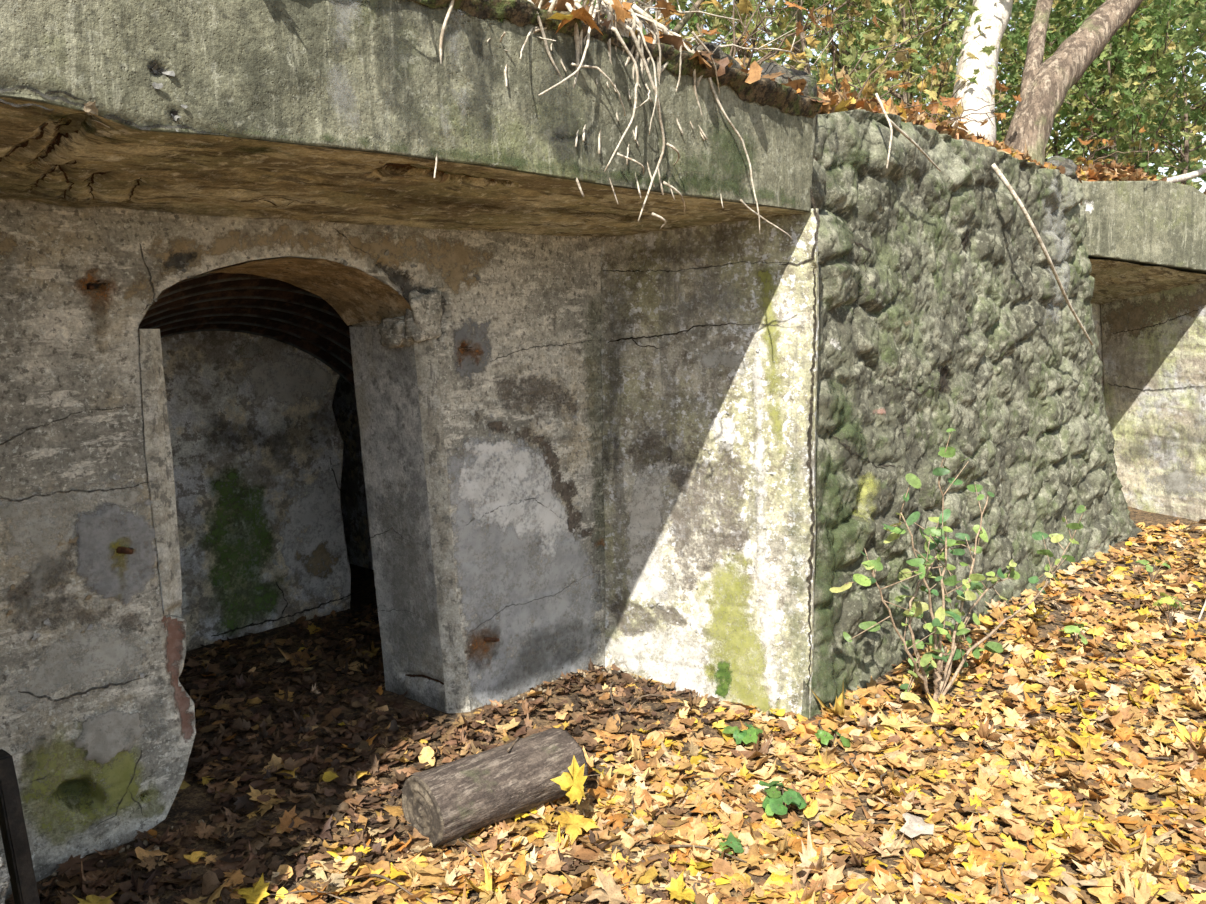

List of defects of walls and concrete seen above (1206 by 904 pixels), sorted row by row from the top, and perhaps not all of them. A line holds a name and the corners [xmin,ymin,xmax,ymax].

crack [0,85,241,201]
corrosion [77,269,115,311]
corrosion [457,340,483,365]
crack [888,380,939,396]
crack [490,188,905,692]
crack [467,498,561,525]
peeling [5,537,150,711]
crack [470,572,594,632]
spalling [161,615,195,743]